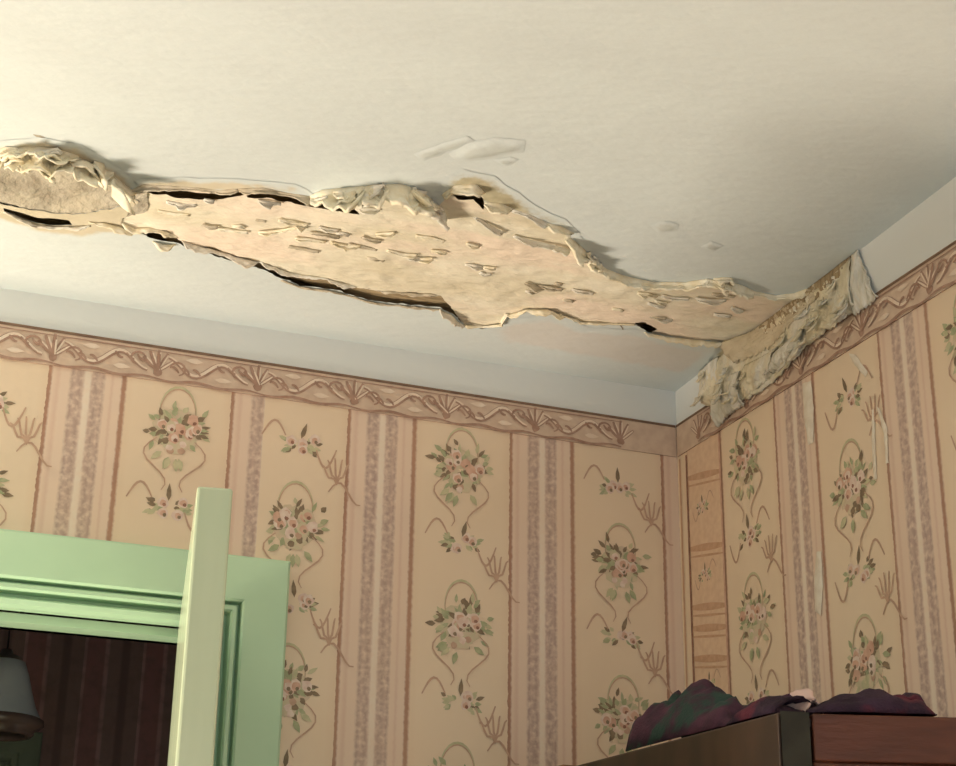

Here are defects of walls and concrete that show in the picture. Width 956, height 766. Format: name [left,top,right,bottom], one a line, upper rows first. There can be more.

spalling [0,134,878,427]